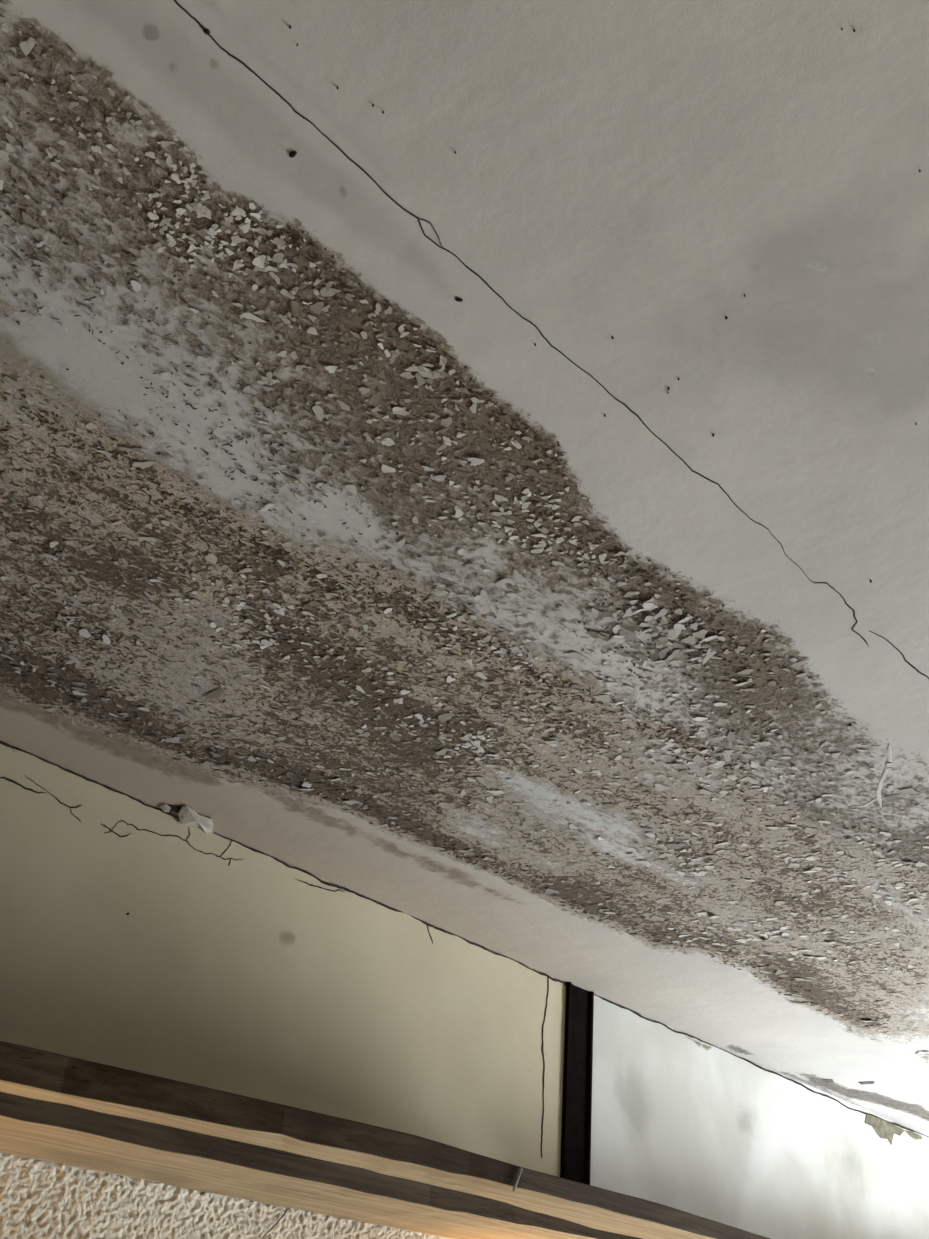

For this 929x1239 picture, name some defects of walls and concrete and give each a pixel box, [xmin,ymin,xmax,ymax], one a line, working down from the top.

peeling [0,290,50,329]
crack [173,0,929,679]
peeling [158,357,204,410]
peeling [541,604,569,624]
flaking render [159,803,214,833]
crack [0,740,567,1158]
crack [595,995,929,1138]
peeling [781,1072,929,1145]